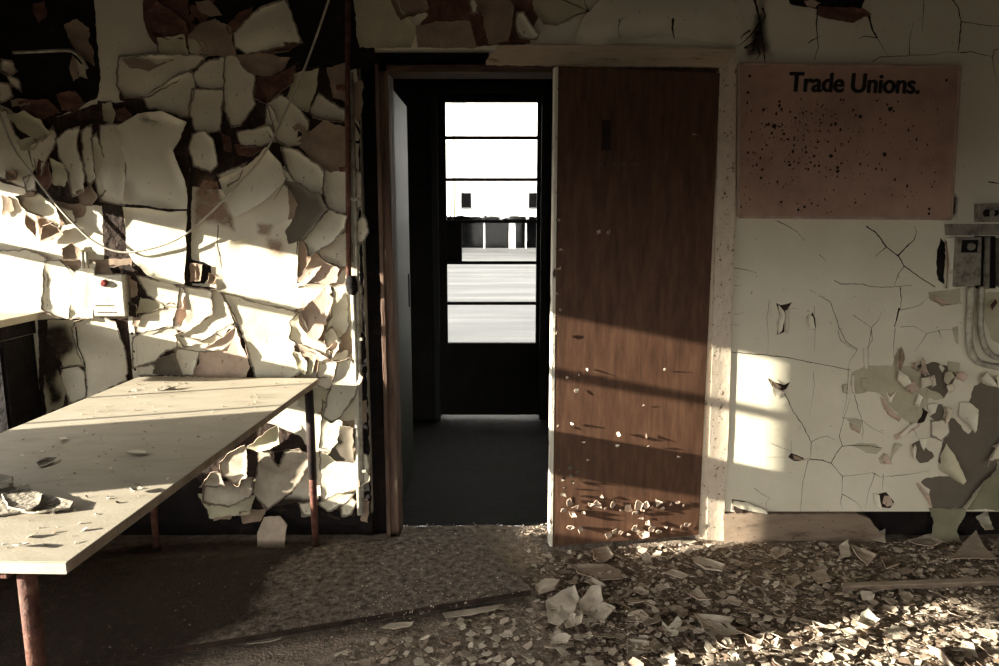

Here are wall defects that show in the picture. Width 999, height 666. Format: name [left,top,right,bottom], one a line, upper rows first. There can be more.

crack [808,15,820,60]
crack [859,0,998,86]
peeling [0,0,587,531]
peeling [776,302,792,335]
peeling [768,378,790,397]
crack [733,226,955,511]
peeling [842,347,999,560]